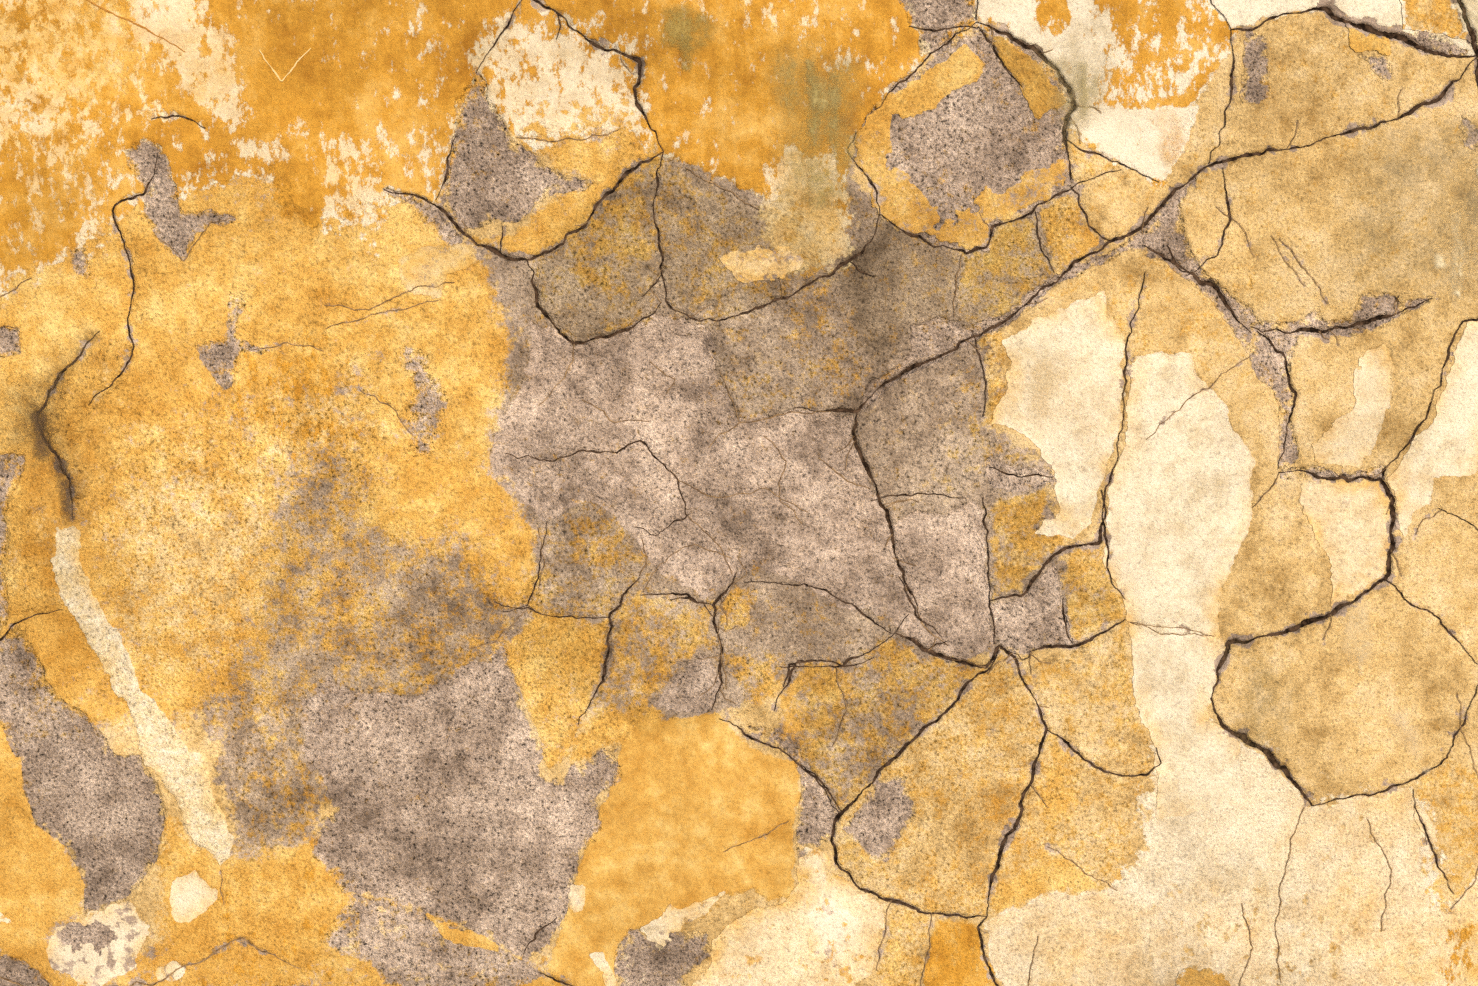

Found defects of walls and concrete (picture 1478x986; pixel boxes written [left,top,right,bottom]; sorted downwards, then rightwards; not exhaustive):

flaking render [382,72,593,299]
flaking render [850,0,1074,252]
flaking render [1240,33,1273,105]
peeling [1346,0,1478,81]
crack [35,115,234,520]
crack [252,282,455,351]
crack [359,389,414,436]
crack [384,0,1478,986]
flaking render [485,177,1478,820]
flaking render [0,453,167,986]
peeling [169,870,218,923]
flaking render [301,644,622,986]